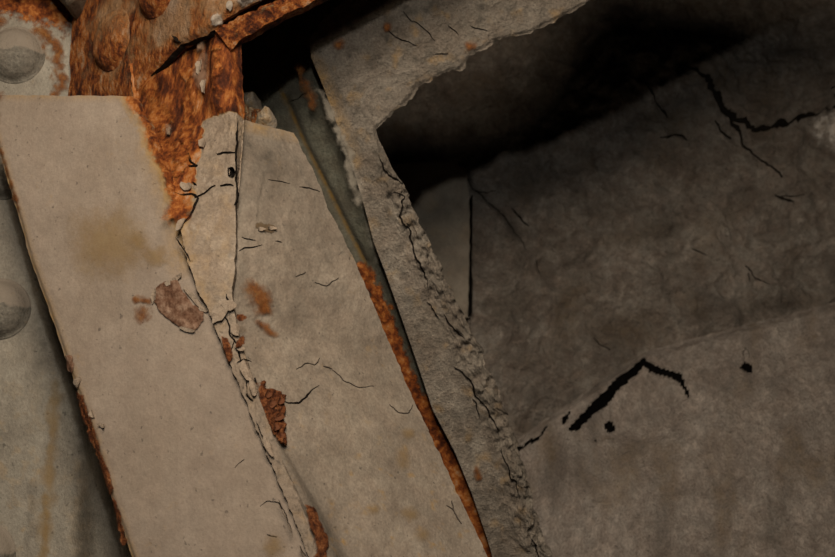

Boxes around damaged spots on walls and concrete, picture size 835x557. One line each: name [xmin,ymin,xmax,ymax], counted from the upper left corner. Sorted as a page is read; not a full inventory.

corrosion [0,0,71,96]
corrosion [65,355,127,545]
corrosion [141,66,195,222]
spalling [150,273,209,332]
corrosion [211,41,224,113]
crack [175,122,281,260]
crack [212,294,257,401]
crack [379,157,464,338]
corrosion [357,262,492,557]
crack [454,367,548,497]
crack [568,358,690,432]
crack [686,66,835,202]